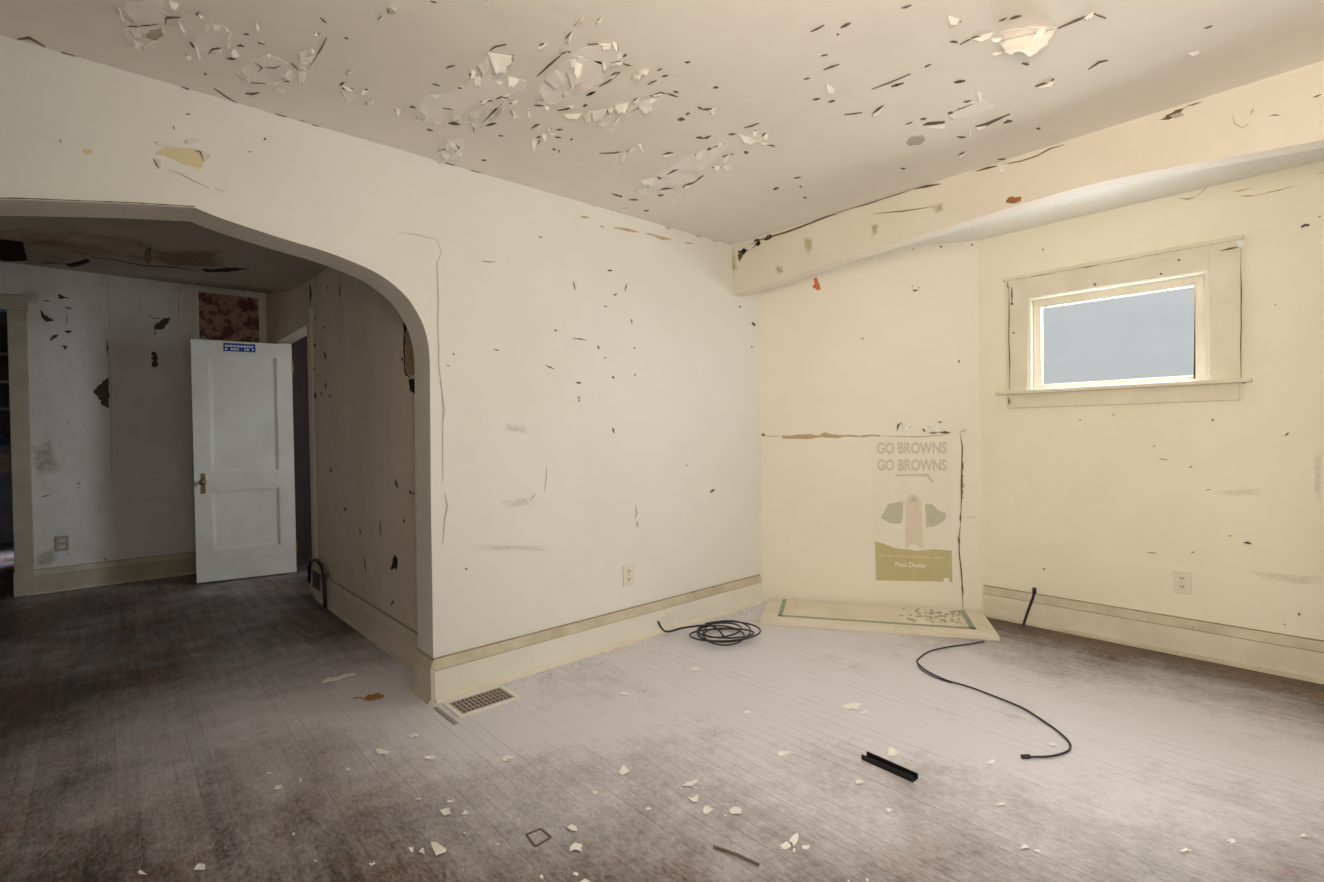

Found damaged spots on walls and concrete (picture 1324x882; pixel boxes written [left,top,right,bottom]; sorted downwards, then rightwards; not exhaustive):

peeling [118,0,327,103]
peeling [394,14,679,166]
spalling [812,54,839,103]
peeling [906,80,1013,158]
peeling [947,12,1106,65]
peeling [154,126,222,191]
peeling [581,123,784,245]
flaking render [93,377,110,408]
crack [761,429,976,602]